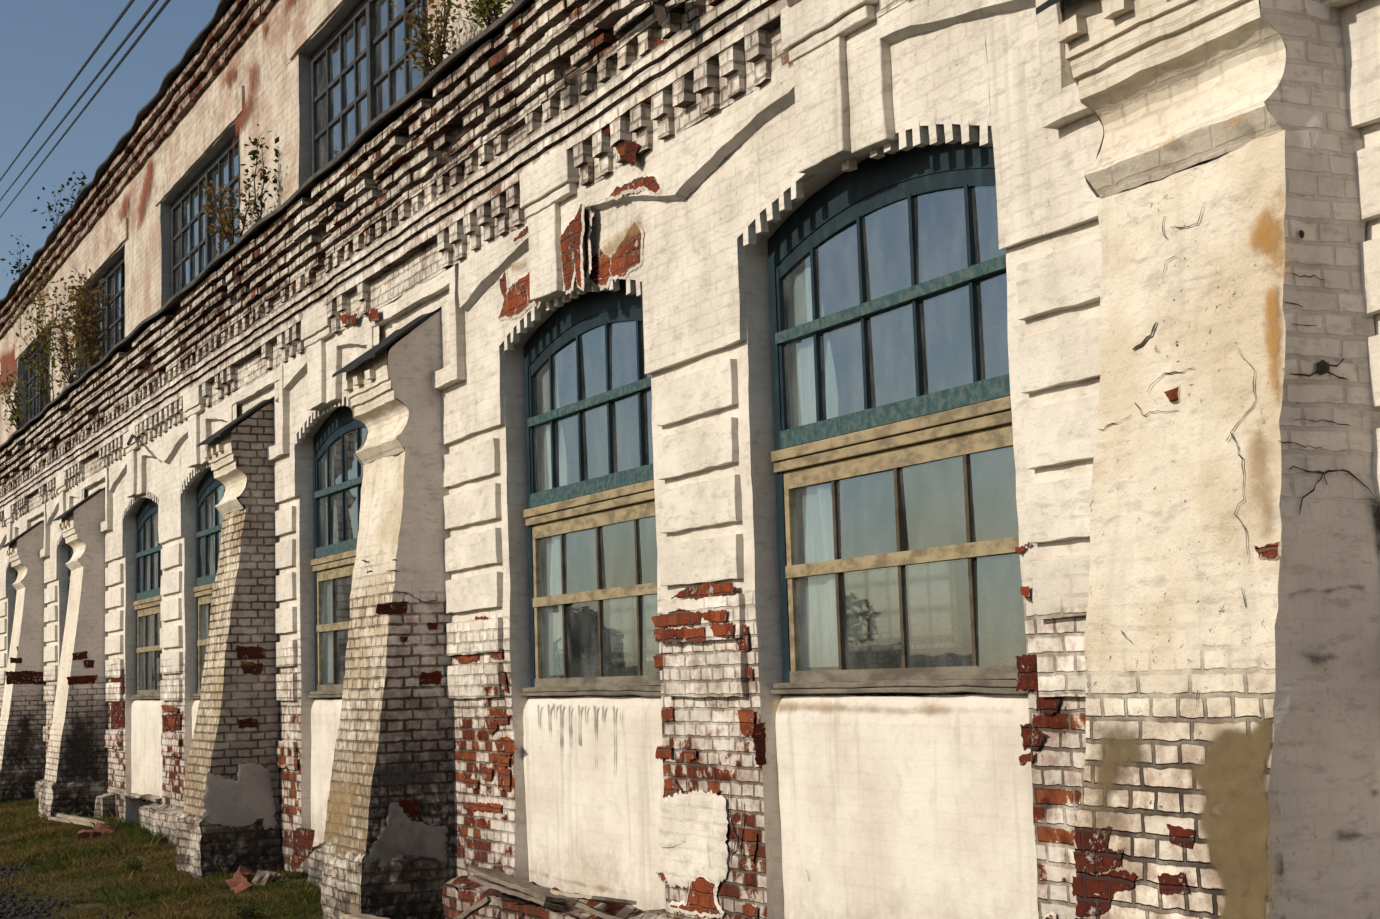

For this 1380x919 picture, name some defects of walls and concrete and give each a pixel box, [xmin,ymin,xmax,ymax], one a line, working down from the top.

peeling [560,125,663,295]
peeling [498,269,550,321]
crack [1133,322,1157,350]
crack [1098,367,1194,430]
crack [1291,358,1349,380]
crack [1226,347,1256,607]
crack [1280,419,1374,514]
flaking render [651,582,752,680]
flaking render [1015,654,1061,766]
spalling [669,875,725,919]
flaking render [1072,826,1137,917]
flaking render [1157,872,1190,894]